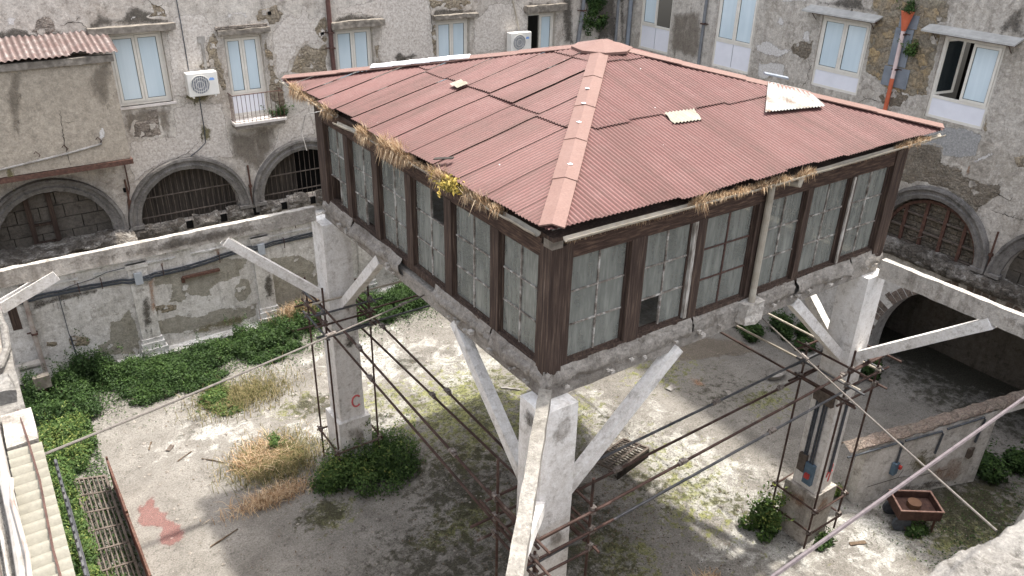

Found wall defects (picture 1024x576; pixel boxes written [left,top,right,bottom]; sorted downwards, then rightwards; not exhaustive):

peeling [128,0,233,181]
peeling [253,0,527,151]
flaking render [979,113,998,139]
flaking render [900,142,1006,216]
flaking render [152,256,259,336]